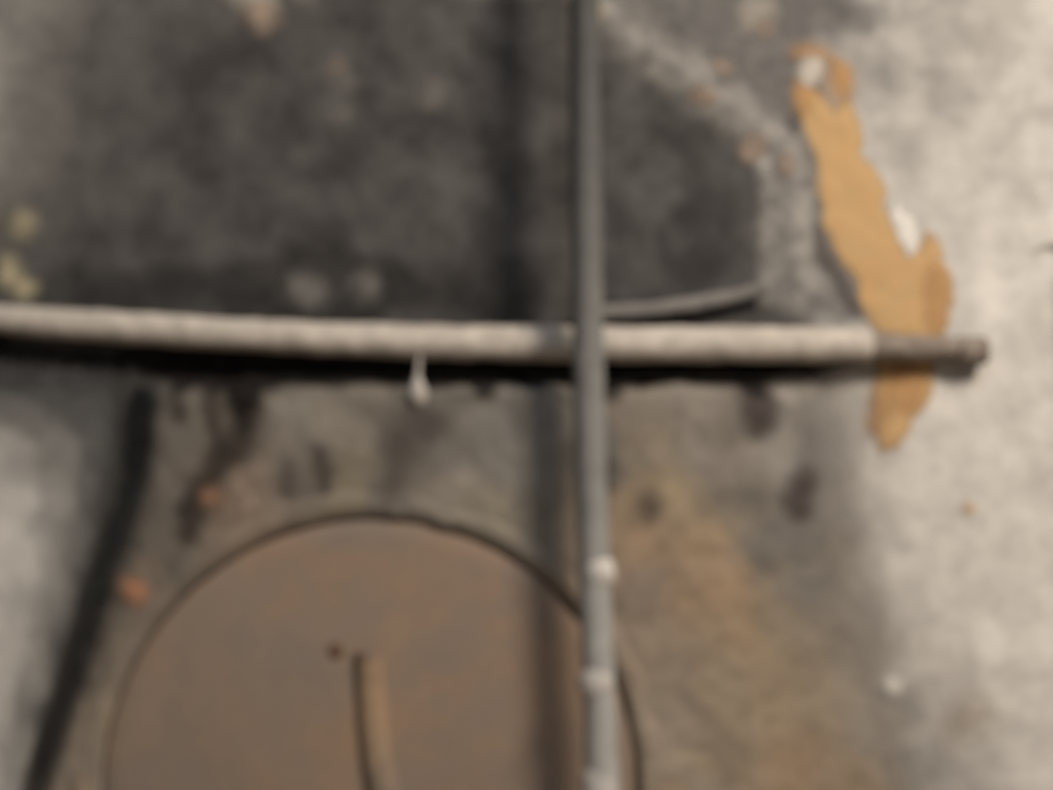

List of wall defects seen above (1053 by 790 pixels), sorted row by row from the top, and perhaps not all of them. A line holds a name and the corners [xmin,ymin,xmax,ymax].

peeling [795,48,953,336]
leakage [88,264,288,313]
leakage [337,266,542,321]
leakage [737,366,765,394]
peeling [869,361,934,451]